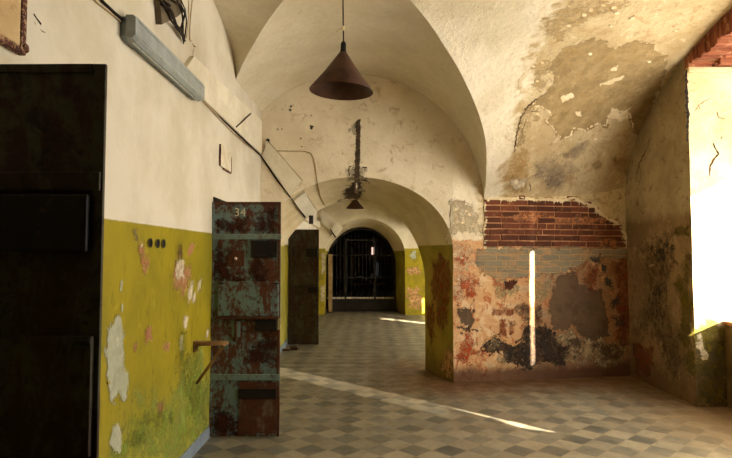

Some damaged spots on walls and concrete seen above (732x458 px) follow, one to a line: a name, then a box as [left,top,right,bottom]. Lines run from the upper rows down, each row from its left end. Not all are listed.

flaking render [529,0,668,141]
crack [709,137,722,177]
water stain [338,178,369,202]
peeling [172,242,202,303]
spalling [406,195,627,344]
water stain [638,232,681,376]
peeling [103,304,153,405]
peeling [440,346,453,378]
peeling [480,322,626,371]
peeling [109,423,122,454]